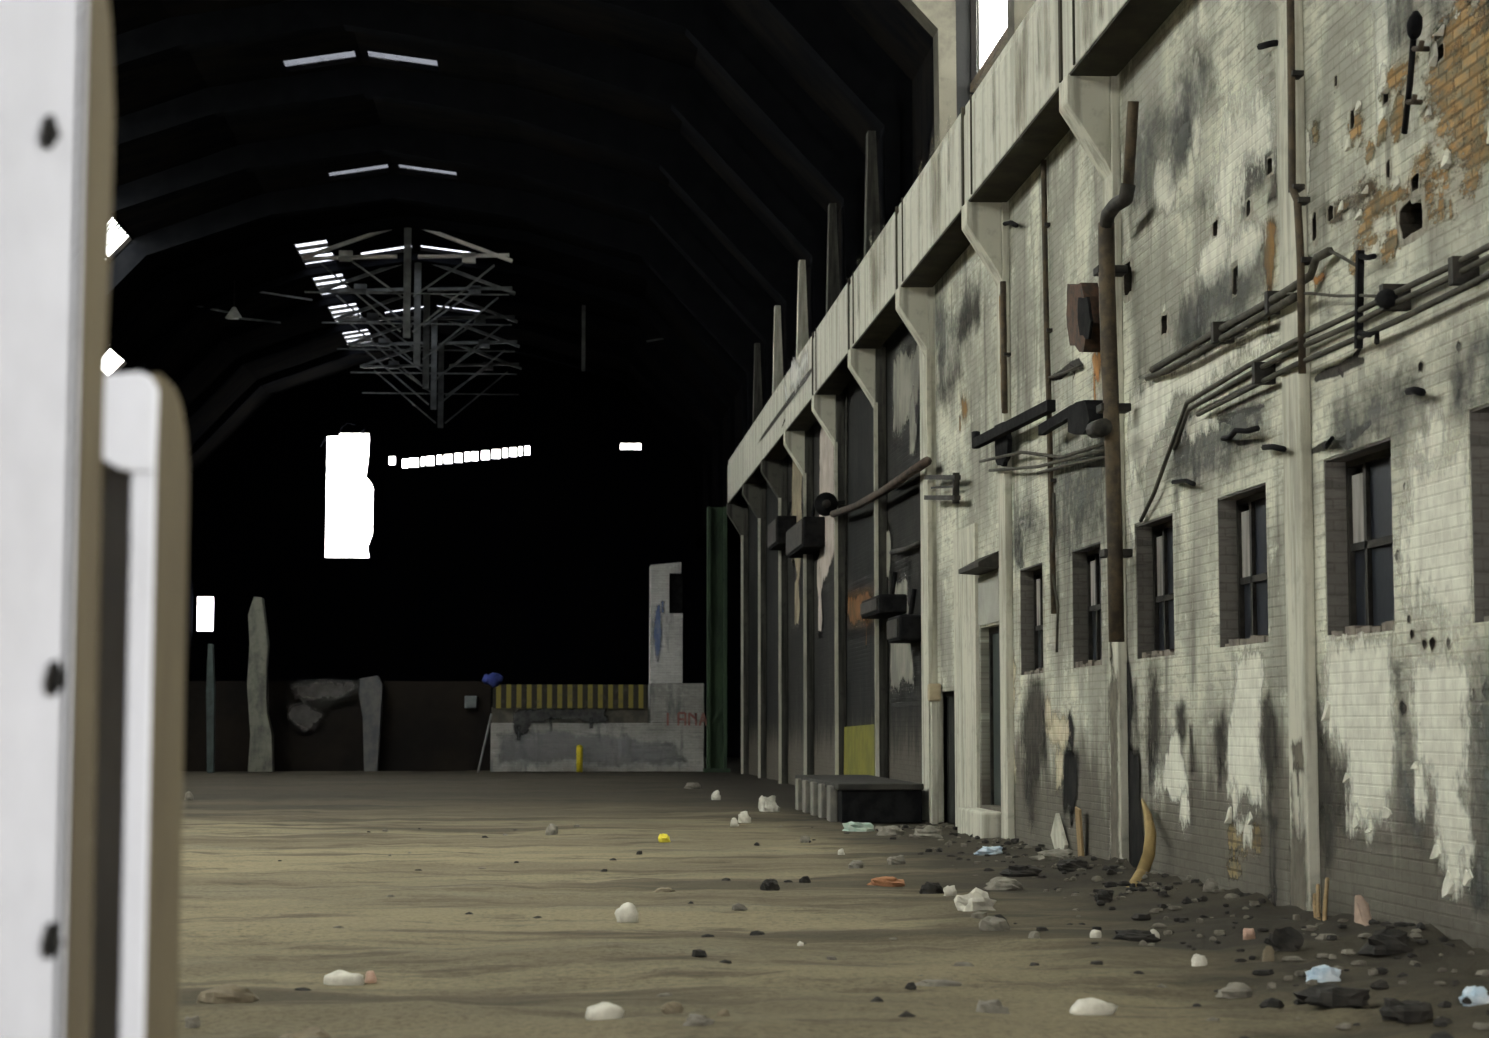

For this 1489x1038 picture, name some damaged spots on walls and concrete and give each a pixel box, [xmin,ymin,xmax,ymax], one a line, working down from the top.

damp [1173,110,1191,178]
damp [1267,175,1277,205]
spalling [1311,0,1489,277]
corrosion [1092,352,1101,400]
corrosion [847,589,872,645]
peeling [1321,405,1485,900]
damp [1020,678,1078,827]
peeling [1154,730,1190,830]
peeling [1224,648,1264,881]